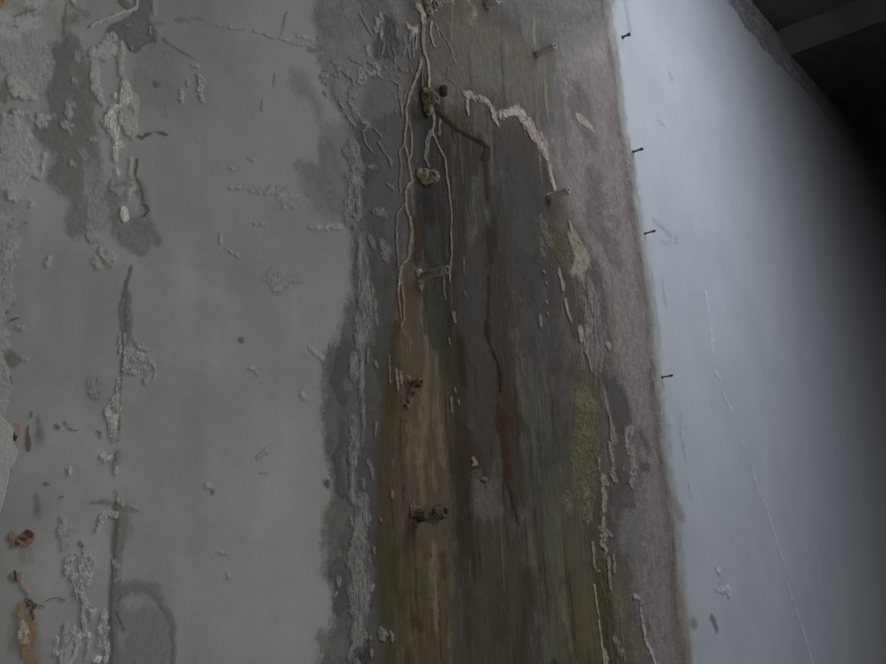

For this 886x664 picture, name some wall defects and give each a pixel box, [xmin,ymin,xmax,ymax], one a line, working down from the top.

peeling [0,73,76,207]
leakage [32,0,206,271]
crack [133,130,168,246]
crack [436,105,491,202]
peeling [0,415,21,513]
crack [26,411,60,451]
crack [97,266,134,474]
leakage [287,0,695,664]
crack [484,274,502,392]
corrosion [8,529,45,664]
crack [90,498,140,664]